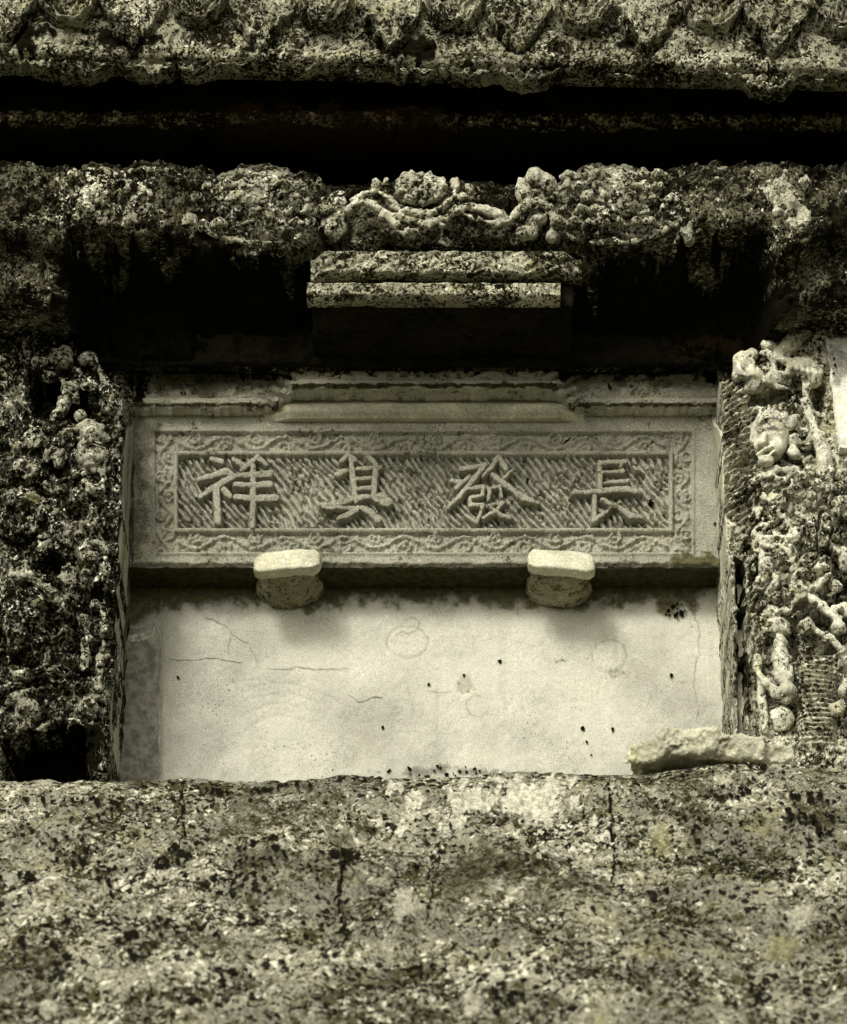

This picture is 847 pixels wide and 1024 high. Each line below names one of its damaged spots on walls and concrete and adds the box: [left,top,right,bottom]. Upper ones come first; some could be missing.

crack [172,603,351,669]
crack [595,780,622,886]
crack [333,849,350,949]